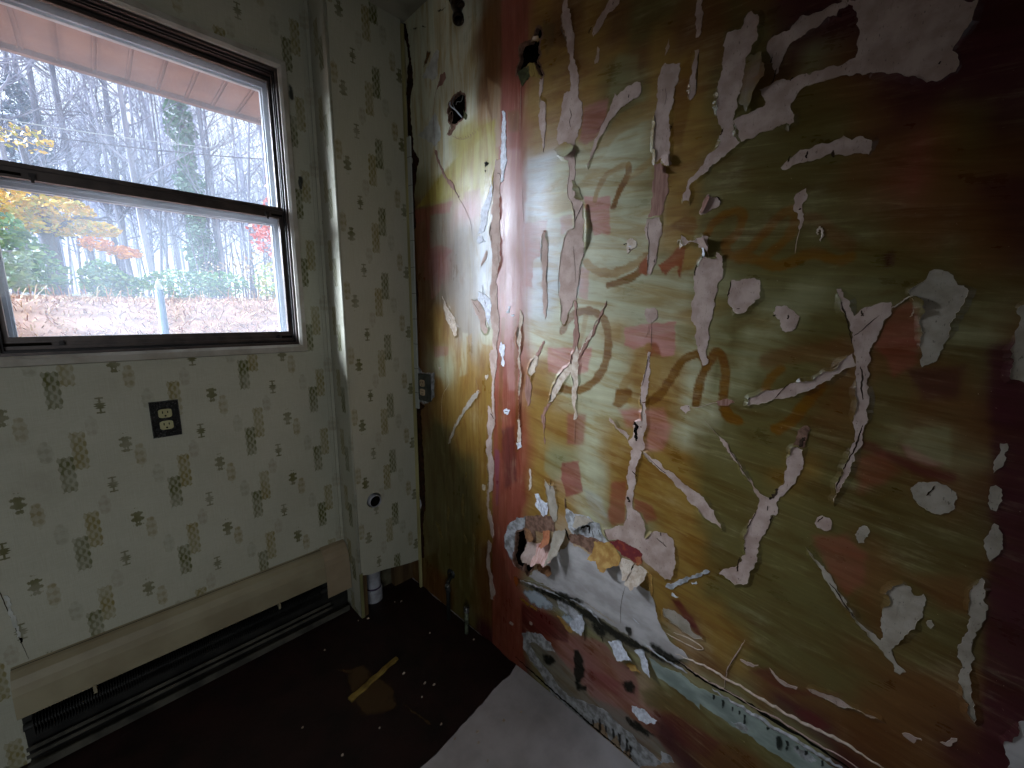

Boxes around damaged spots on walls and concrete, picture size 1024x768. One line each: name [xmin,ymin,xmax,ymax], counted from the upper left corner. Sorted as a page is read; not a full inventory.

spalling [417,90,467,146]
peeling [623,0,704,275]
peeling [681,0,986,215]
peeling [515,0,641,444]
peeling [448,111,726,600]
peeling [677,232,765,365]
peeling [680,269,977,531]
peeling [705,421,810,588]
peeling [984,485,1003,561]
flaking render [509,621,674,768]
peeling [805,546,934,674]
peeling [956,576,992,727]